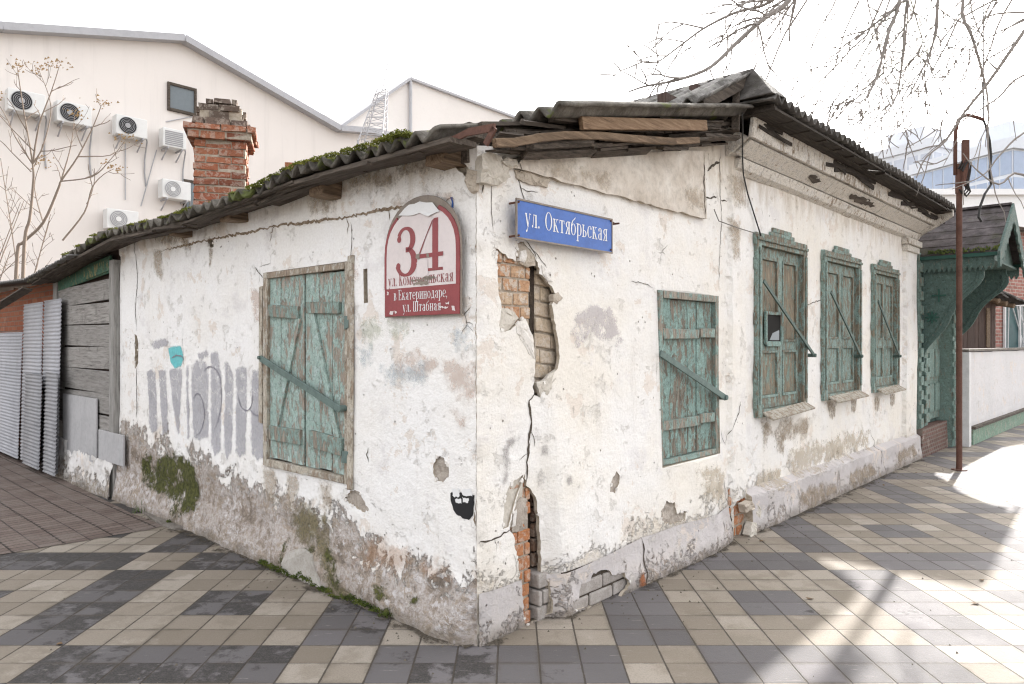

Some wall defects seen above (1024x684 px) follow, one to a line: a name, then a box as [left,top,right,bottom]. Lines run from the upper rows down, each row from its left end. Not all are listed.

crack [134,206,402,331]
crack [446,185,493,472]
flaking render [494,241,563,397]
crack [521,395,535,482]
damp [764,420,808,452]
damp [141,455,152,486]
spalling [434,455,449,482]
crack [473,500,512,550]
spalling [660,501,689,524]
flaking render [502,477,549,626]
crack [640,537,648,584]
flaking render [561,562,631,612]